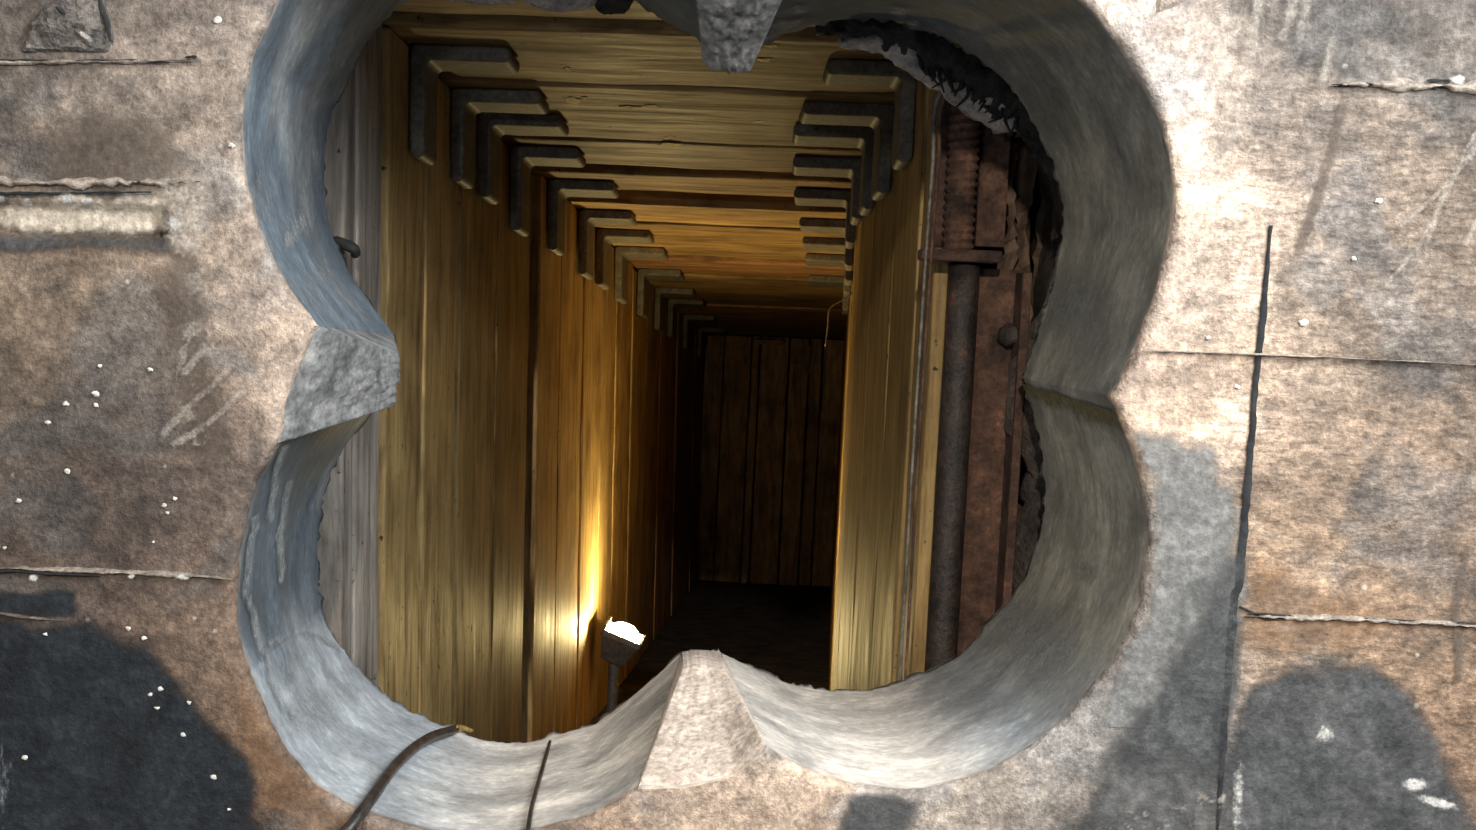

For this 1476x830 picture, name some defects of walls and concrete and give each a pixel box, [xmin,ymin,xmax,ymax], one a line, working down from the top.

spalling [21,0,114,54]
crack [0,55,197,63]
spalling [696,0,805,75]
crack [1427,78,1453,89]
spalling [278,326,400,443]
crack [1216,225,1293,830]
crack [0,569,99,577]